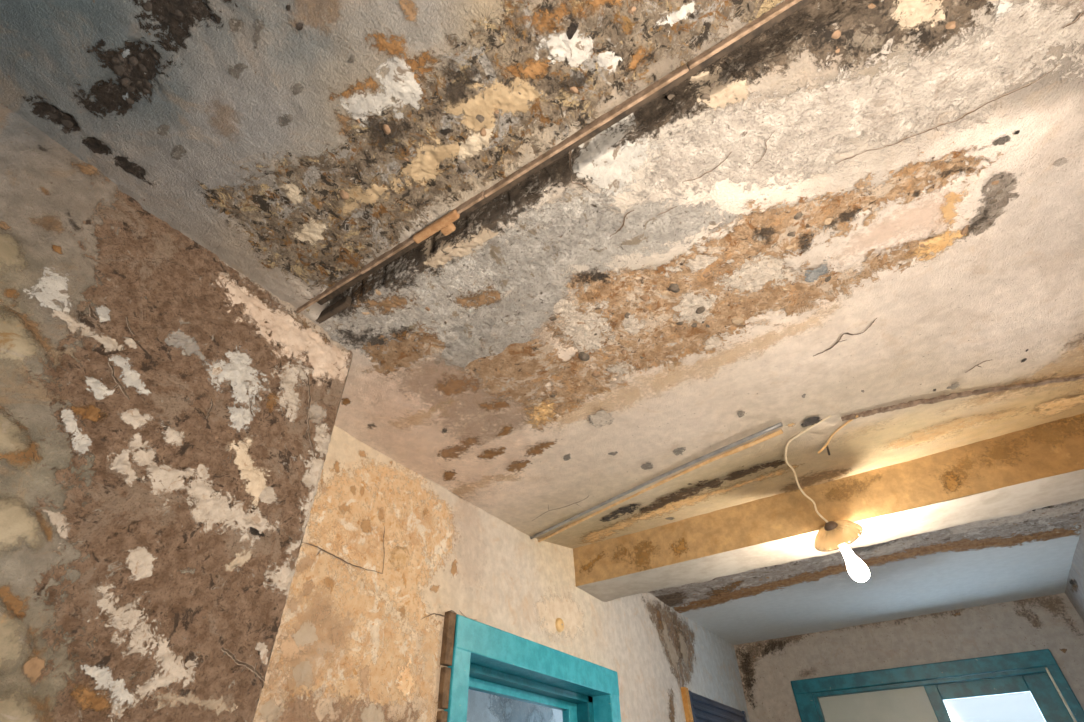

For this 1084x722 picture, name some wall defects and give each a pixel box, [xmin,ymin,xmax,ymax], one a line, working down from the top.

flaking render [196,0,784,300]
water stain [32,213,81,231]
flaking render [953,171,1023,243]
water stain [884,392,1084,448]
water stain [579,464,852,573]
flaking render [648,499,1084,613]
flaking render [276,606,331,662]
flaking render [259,660,422,722]